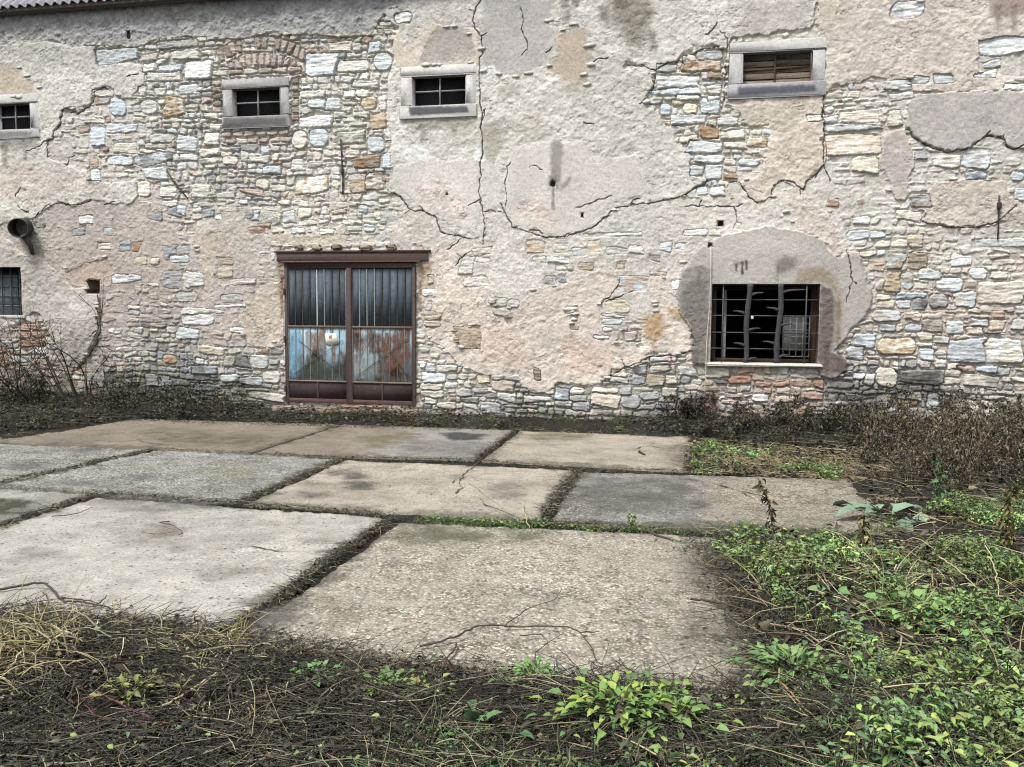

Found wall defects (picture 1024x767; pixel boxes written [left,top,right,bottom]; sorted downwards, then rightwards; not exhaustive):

crack [15,188,114,217]
crack [30,74,138,166]
spalling [0,0,1024,422]
damp [551,141,564,207]
crack [395,1,830,265]
crack [907,129,1023,153]